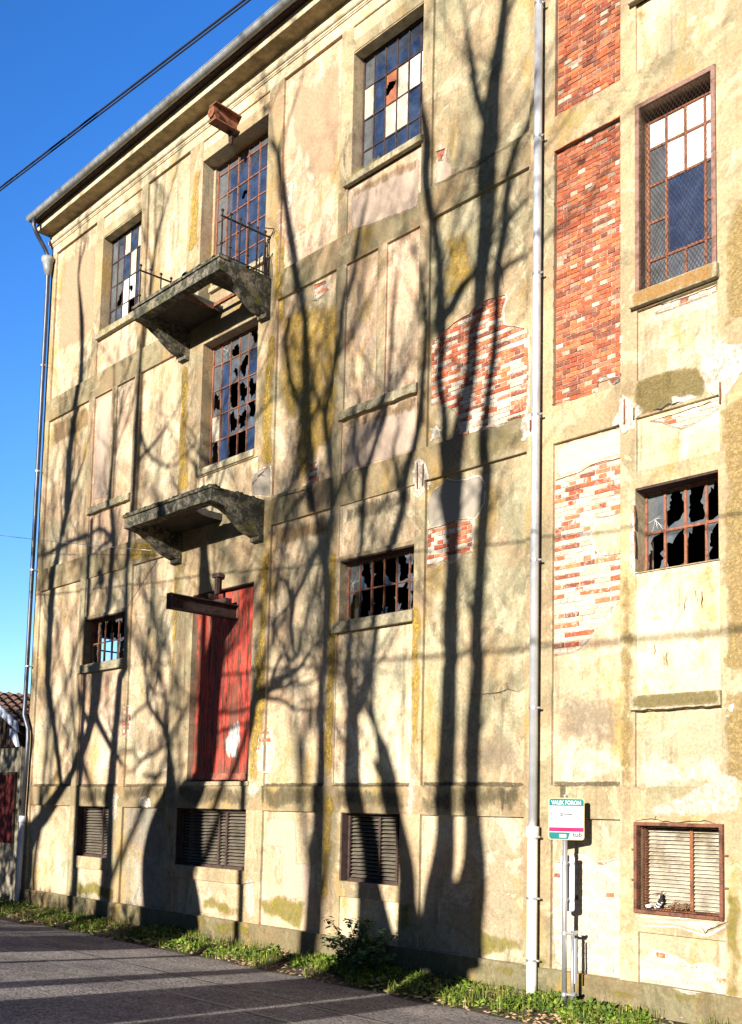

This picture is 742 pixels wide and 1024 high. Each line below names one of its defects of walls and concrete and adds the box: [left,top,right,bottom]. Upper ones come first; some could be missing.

flaking render [430,294,531,441]
peeling [346,405,487,568]
flaking render [554,340,742,657]